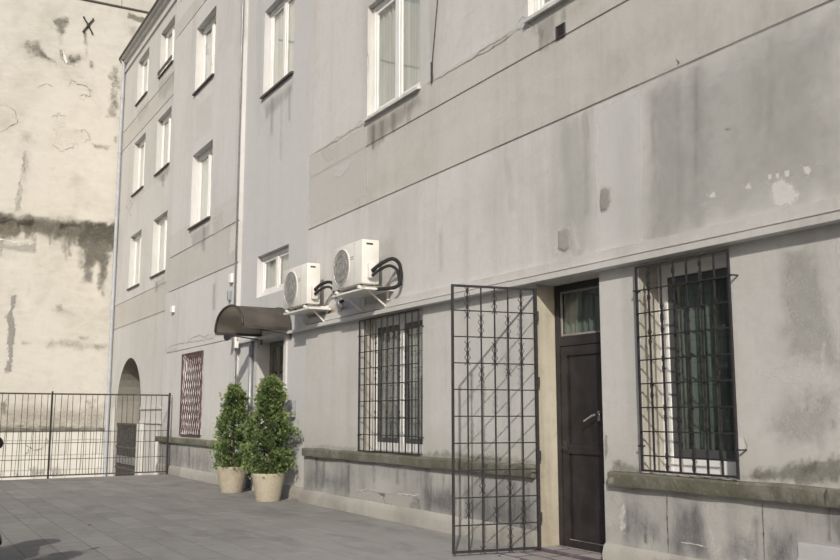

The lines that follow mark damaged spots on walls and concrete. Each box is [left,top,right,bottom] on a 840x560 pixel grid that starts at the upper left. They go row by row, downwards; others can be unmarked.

leakage [660,40,818,211]
peeling [767,170,799,206]
leakage [0,213,115,285]